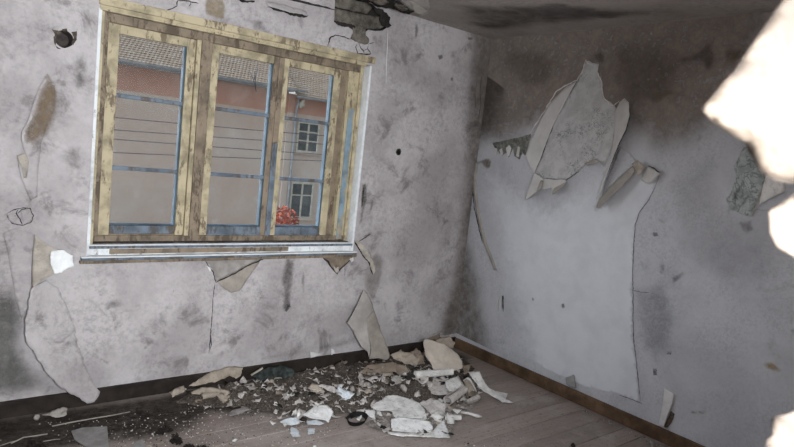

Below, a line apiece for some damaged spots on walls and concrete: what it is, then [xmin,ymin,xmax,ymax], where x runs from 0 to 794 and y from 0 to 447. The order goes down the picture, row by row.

spalling [52,29,77,49]
spalling [334,0,430,45]
damp [726,146,766,217]
peeling [477,60,660,402]
crack [208,285,216,350]